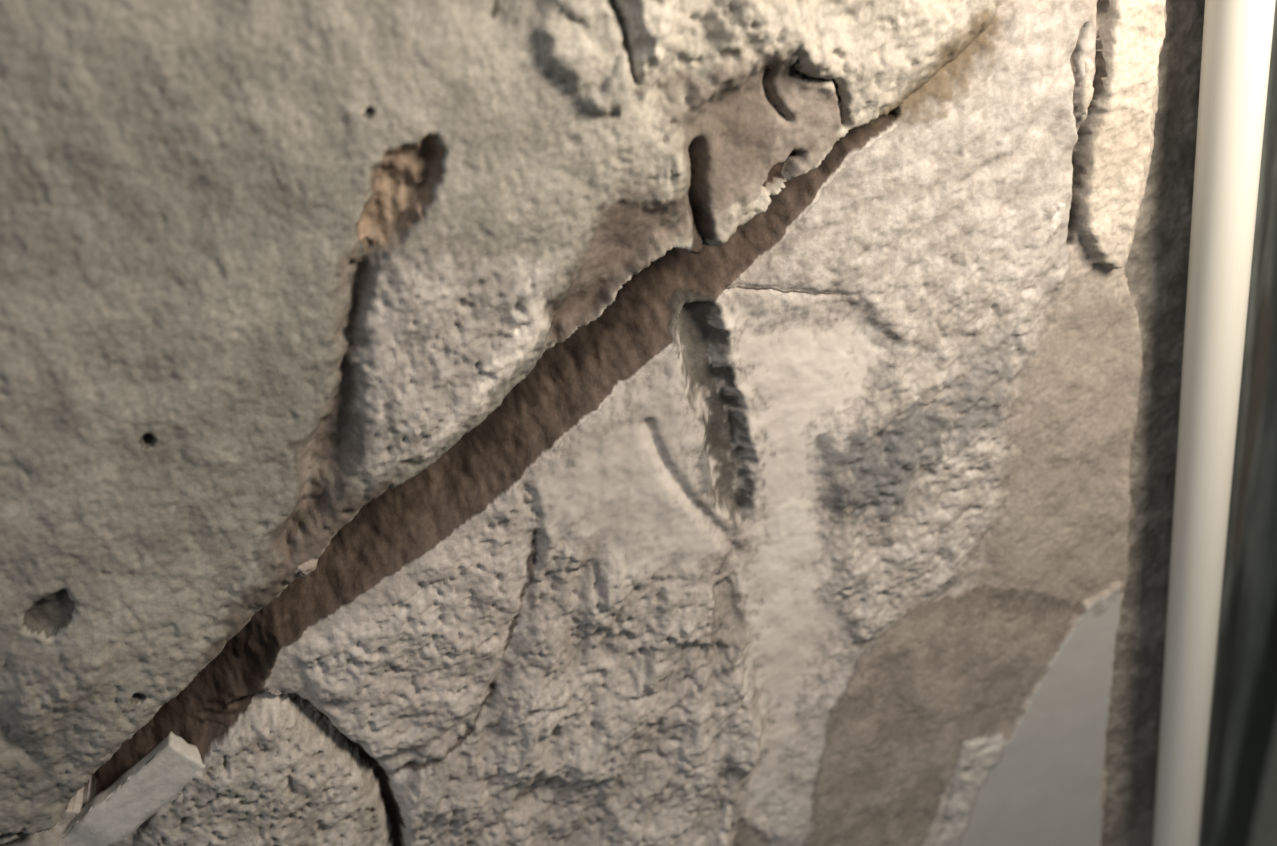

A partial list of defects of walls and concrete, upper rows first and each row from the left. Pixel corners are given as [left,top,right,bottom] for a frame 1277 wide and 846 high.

crack [492,0,500,18]
crack [612,0,631,60]
crack [1066,0,1109,244]
crack [65,59,898,846]
spalling [276,62,854,542]
flaking render [760,0,1205,846]
spalling [60,731,206,846]
flaking render [395,506,769,846]